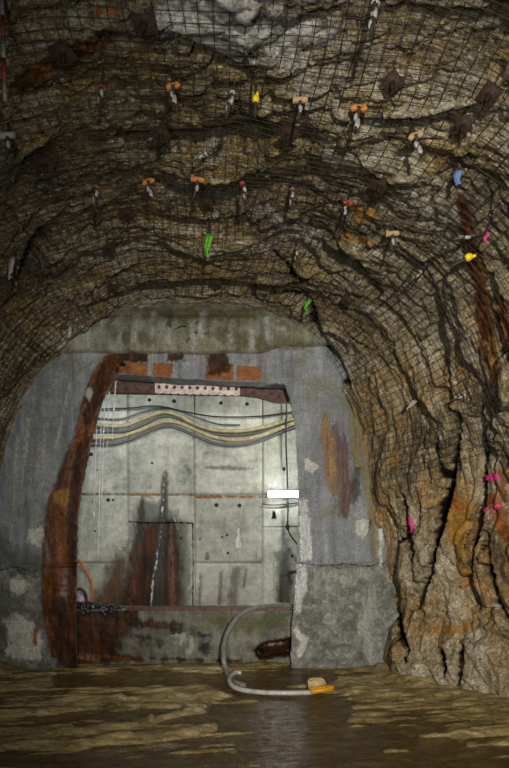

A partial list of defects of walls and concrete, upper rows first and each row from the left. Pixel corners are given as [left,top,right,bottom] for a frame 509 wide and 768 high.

water stain [189,309,207,351]
rust [205,353,262,381]
water stain [249,317,273,351]
rust [454,182,509,384]
rust [41,353,204,668]
rust [322,402,380,565]